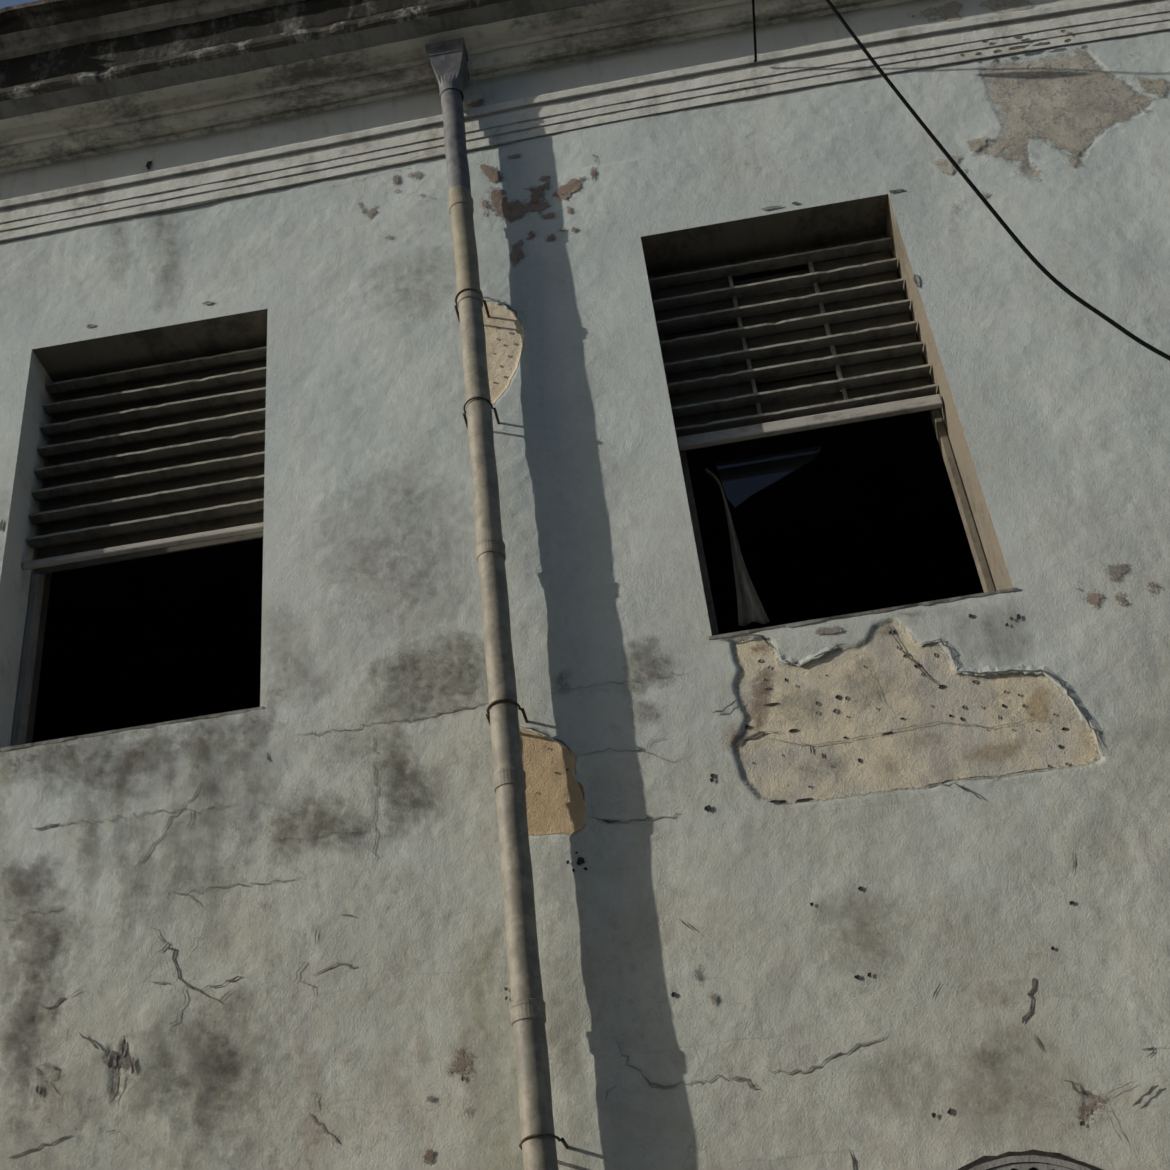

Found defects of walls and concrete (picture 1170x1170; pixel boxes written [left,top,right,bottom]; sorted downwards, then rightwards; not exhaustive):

peeling [933,30,1170,182]
peeling [478,154,597,266]
flaking render [482,295,528,404]
peeling [1076,563,1129,608]
crack [29,773,233,867]
crack [272,702,489,870]
flaking render [519,724,593,835]
crack [581,738,679,762]
crack [588,813,679,823]
flaking render [712,613,1109,804]
crack [150,877,301,1028]
crack [604,1033,887,1104]